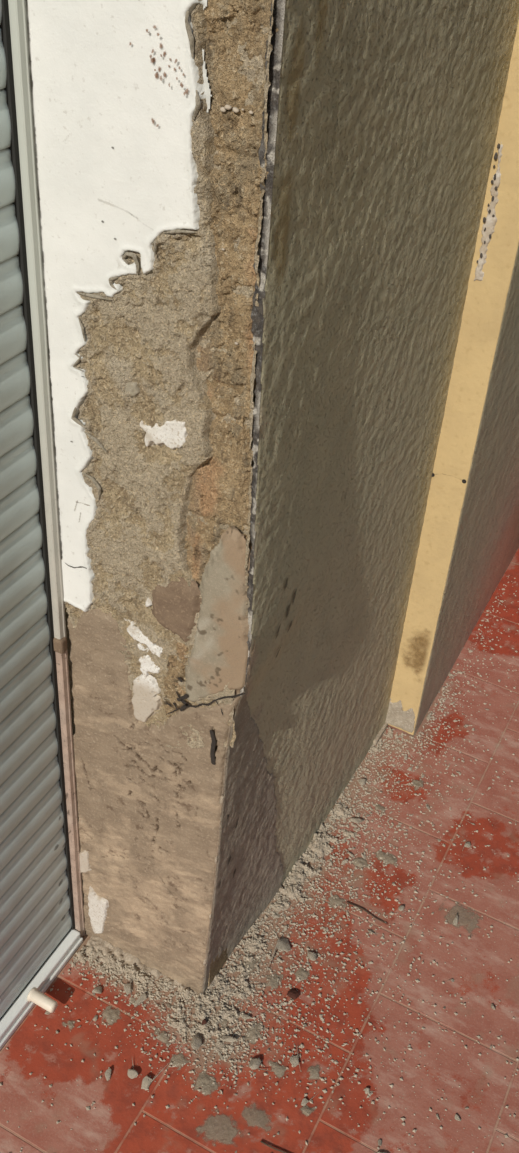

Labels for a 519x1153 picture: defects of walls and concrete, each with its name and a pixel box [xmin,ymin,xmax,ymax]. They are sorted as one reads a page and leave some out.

spalling [64,0,285,794]
crack [166,677,246,765]